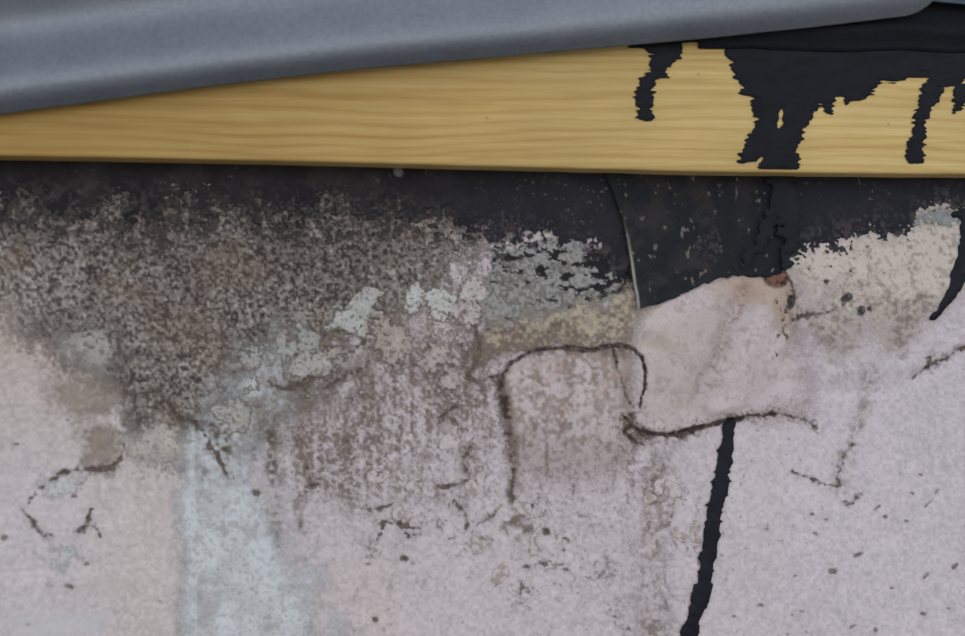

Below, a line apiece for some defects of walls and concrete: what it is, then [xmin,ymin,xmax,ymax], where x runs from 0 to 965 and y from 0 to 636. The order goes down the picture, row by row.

leakage [0,182,648,507]